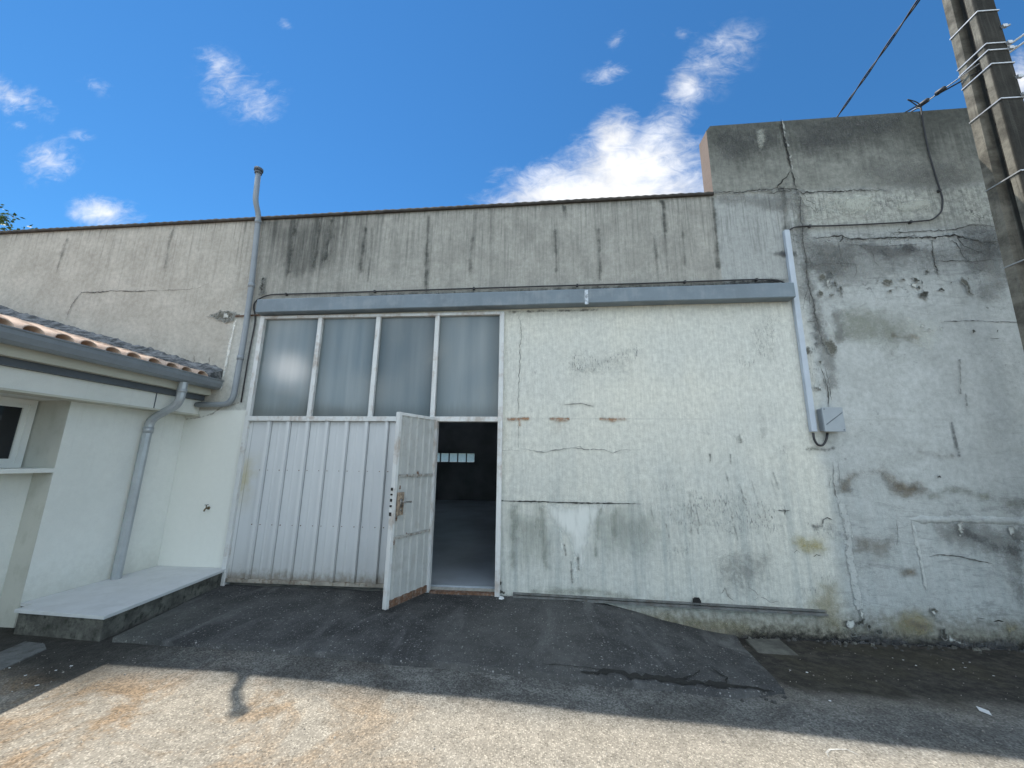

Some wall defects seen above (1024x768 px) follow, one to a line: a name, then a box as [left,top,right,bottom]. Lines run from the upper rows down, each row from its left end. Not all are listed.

crack [718,120,998,344]
leakage [862,245,917,255]
spalling [818,272,844,297]
spalling [877,269,974,300]
spalling [207,309,240,323]
crack [502,314,627,453]
crack [822,463,841,524]
leakage [885,477,917,496]
leakage [551,505,600,572]